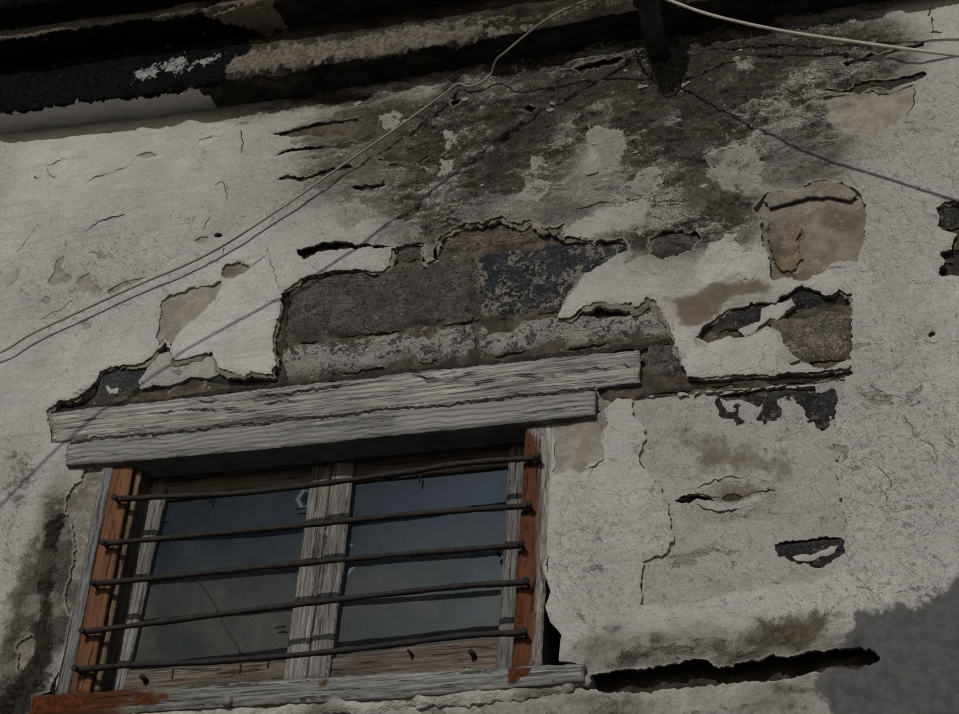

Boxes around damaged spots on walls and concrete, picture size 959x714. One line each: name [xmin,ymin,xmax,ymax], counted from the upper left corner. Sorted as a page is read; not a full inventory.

peeling [732,49,759,75]
peeling [378,110,412,131]
peeling [516,155,553,202]
peeling [586,123,640,176]
damp [683,170,744,219]
peeling [700,143,766,198]
spalling [937,201,959,276]
spalling [47,167,866,614]
damp [0,514,66,714]
spalling [592,648,880,694]
corrosion [133,692,167,705]